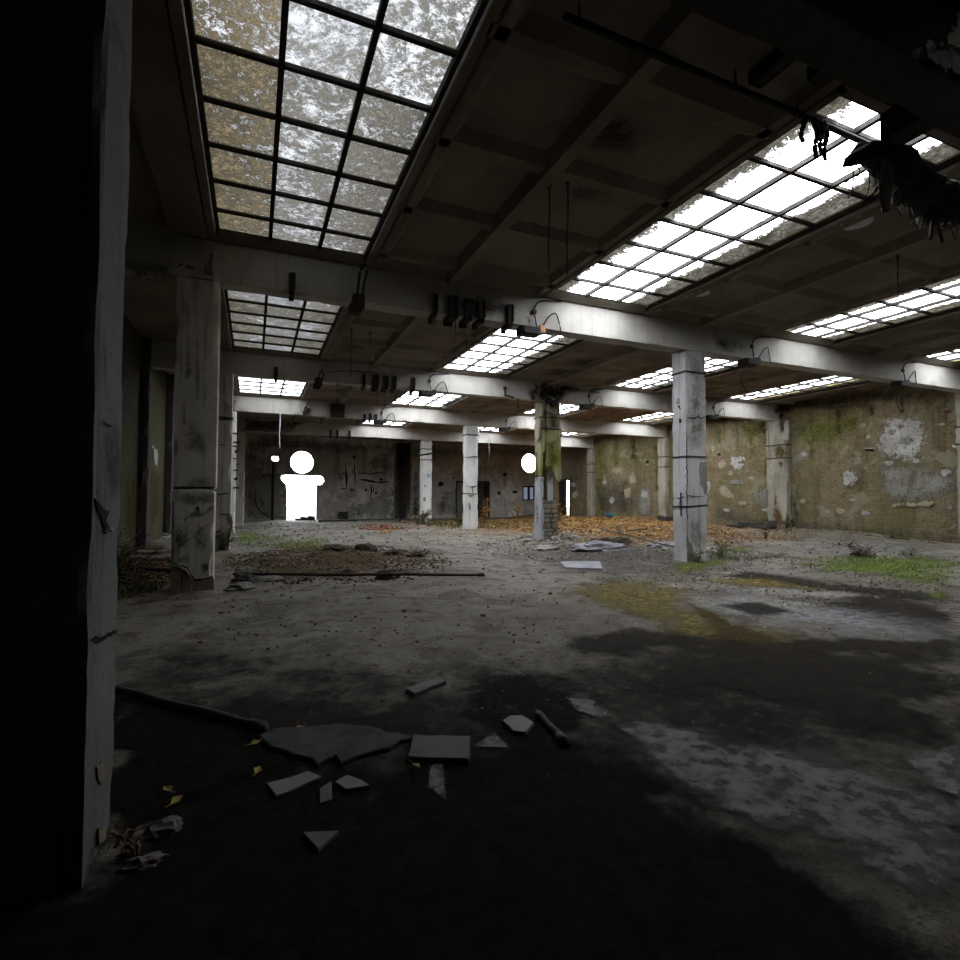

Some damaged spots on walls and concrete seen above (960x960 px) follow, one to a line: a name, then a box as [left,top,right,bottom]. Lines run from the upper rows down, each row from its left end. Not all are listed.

peeling [908,10,960,75]
flaking render [699,445,768,512]
flaking render [842,470,858,486]
flaking render [859,414,957,510]